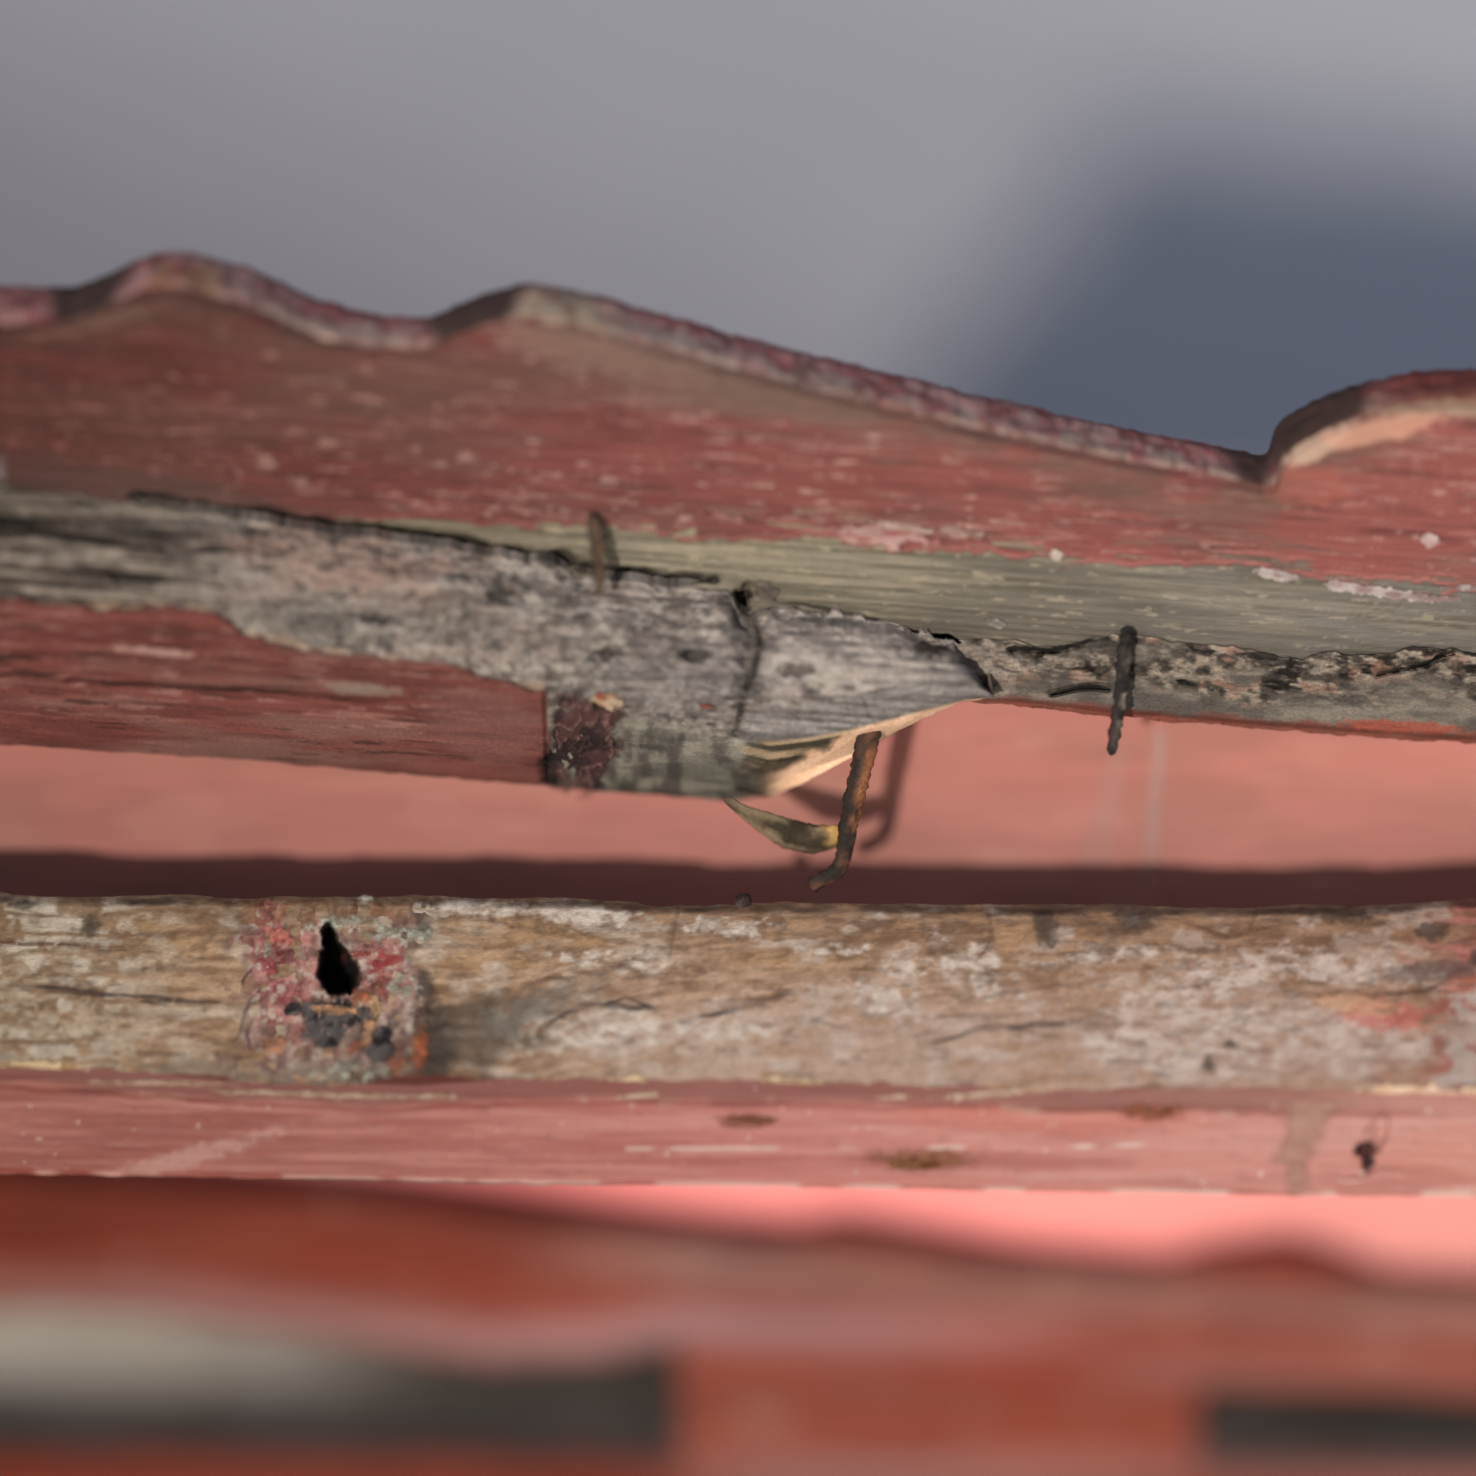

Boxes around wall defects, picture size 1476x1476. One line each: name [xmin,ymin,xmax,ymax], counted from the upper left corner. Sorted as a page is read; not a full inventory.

peeling [824,520,992,552]
peeling [1420,532,1439,548]
peeling [1050,549,1064,561]
peeling [1253,566,1299,582]
peeling [1323,579,1476,603]
crack [789,603,881,621]
crack [738,633,760,718]
peeling [590,692,624,711]
spalling [217,896,456,1099]
spalling [0,1060,74,1070]
spalling [598,1074,659,1099]
spalling [878,1085,1056,1100]